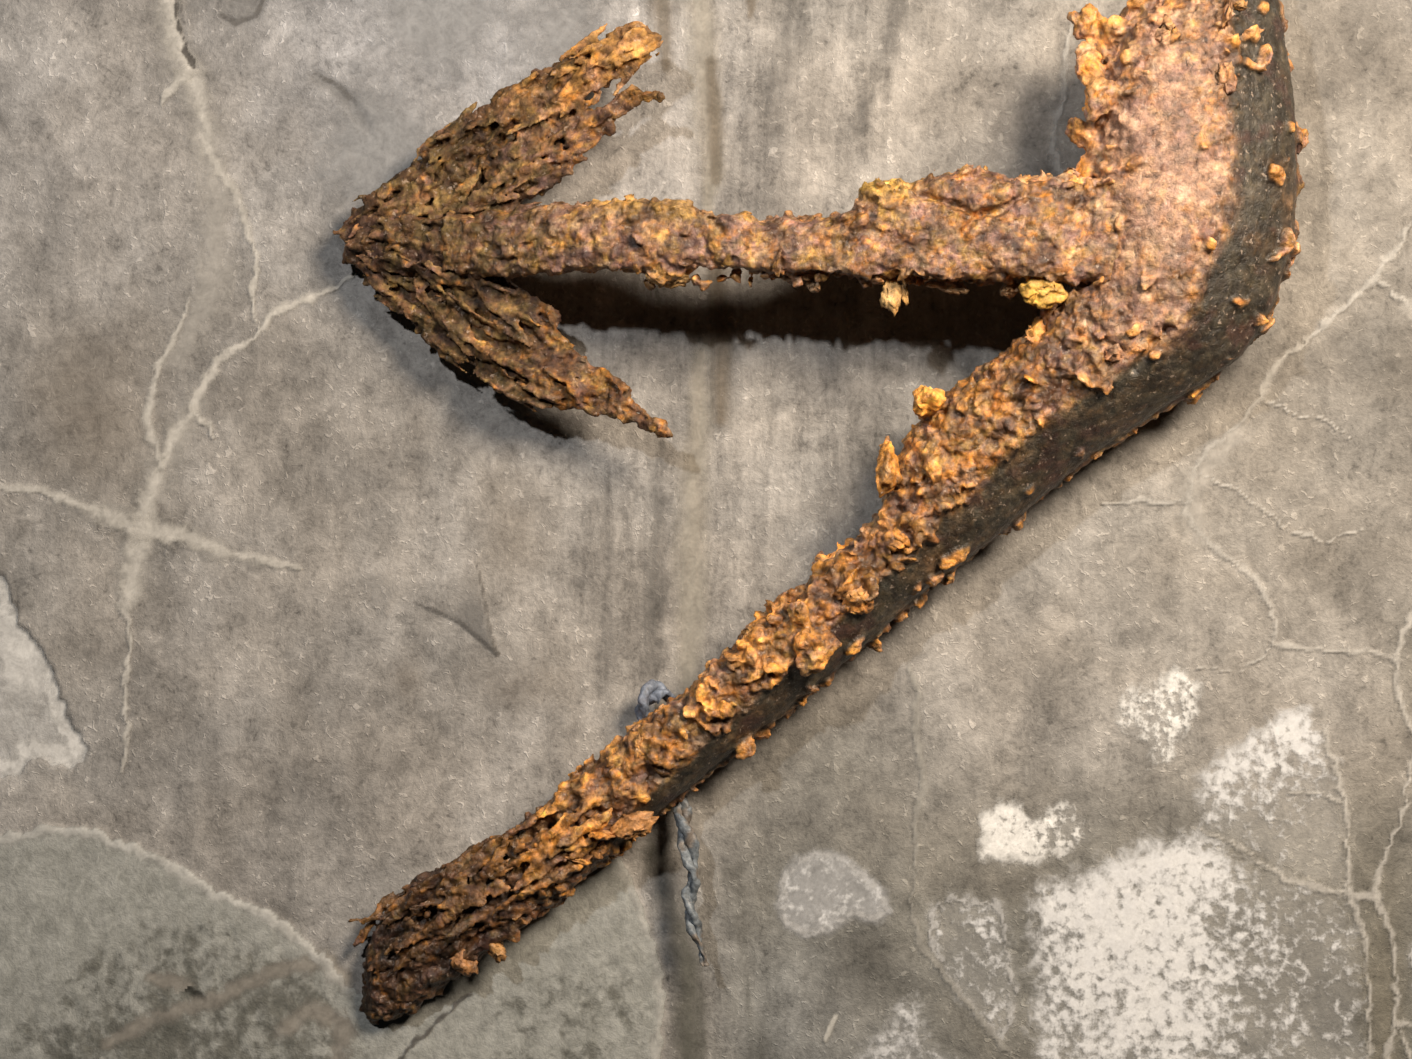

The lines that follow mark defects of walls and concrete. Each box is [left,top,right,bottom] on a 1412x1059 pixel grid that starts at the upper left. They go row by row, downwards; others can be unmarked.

corrosion [1215,61,1238,95]
corrosion [870,275,969,317]
corrosion [999,277,1068,343]
crack [0,0,354,770]
crack [1102,227,1412,1059]
water stain [1118,666,1202,763]
corrosion [565,810,659,866]
water stain [977,802,1081,865]
water stain [777,852,890,936]
water stain [1029,706,1358,1059]
corrosion [450,941,507,977]
water stain [929,894,1019,1040]